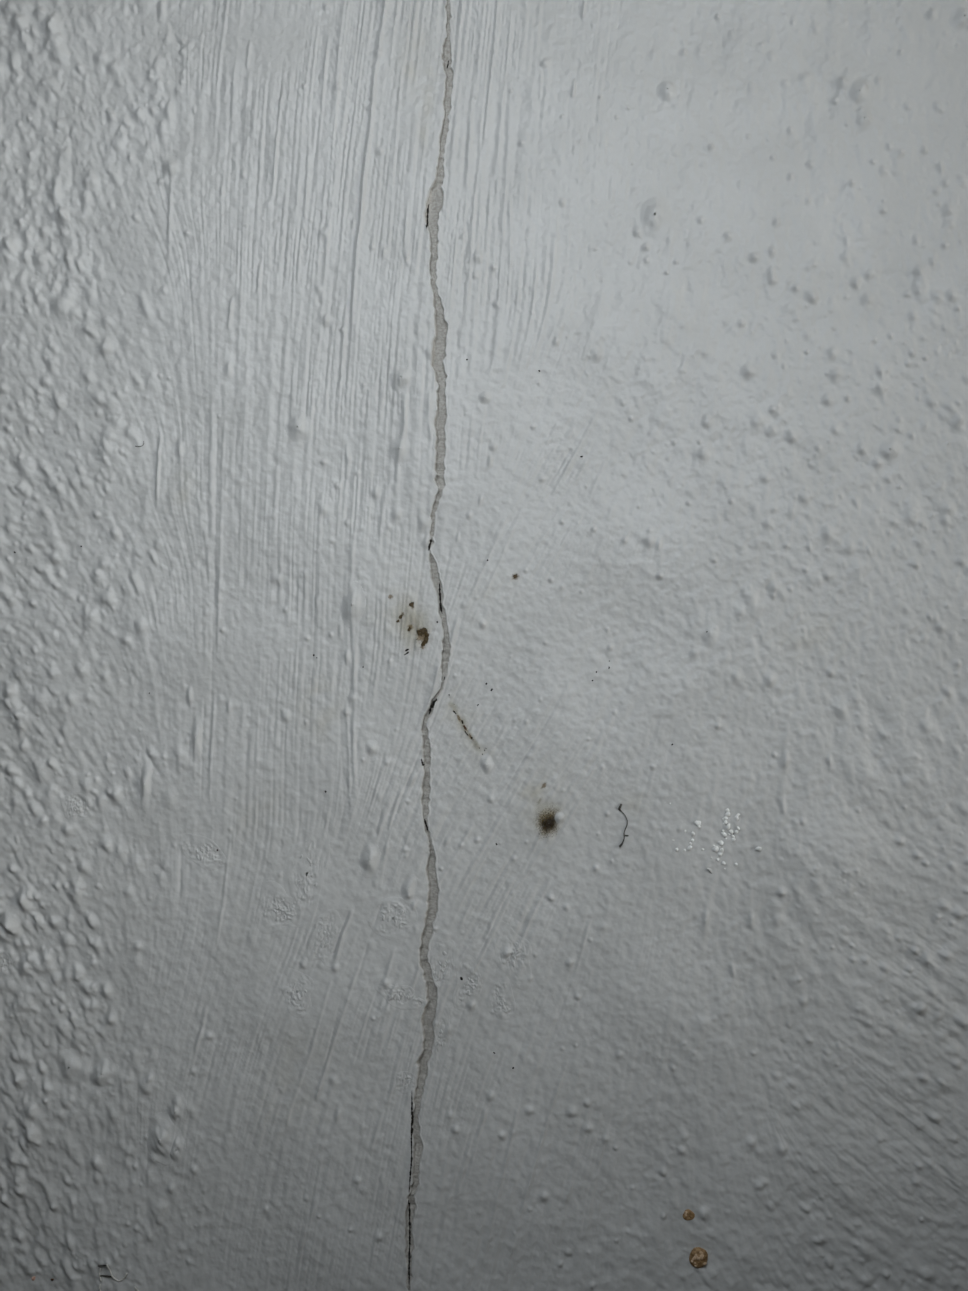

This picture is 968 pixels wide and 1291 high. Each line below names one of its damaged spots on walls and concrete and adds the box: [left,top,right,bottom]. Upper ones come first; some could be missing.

corrosion [396,602,429,655]
crack [402,0,487,1291]